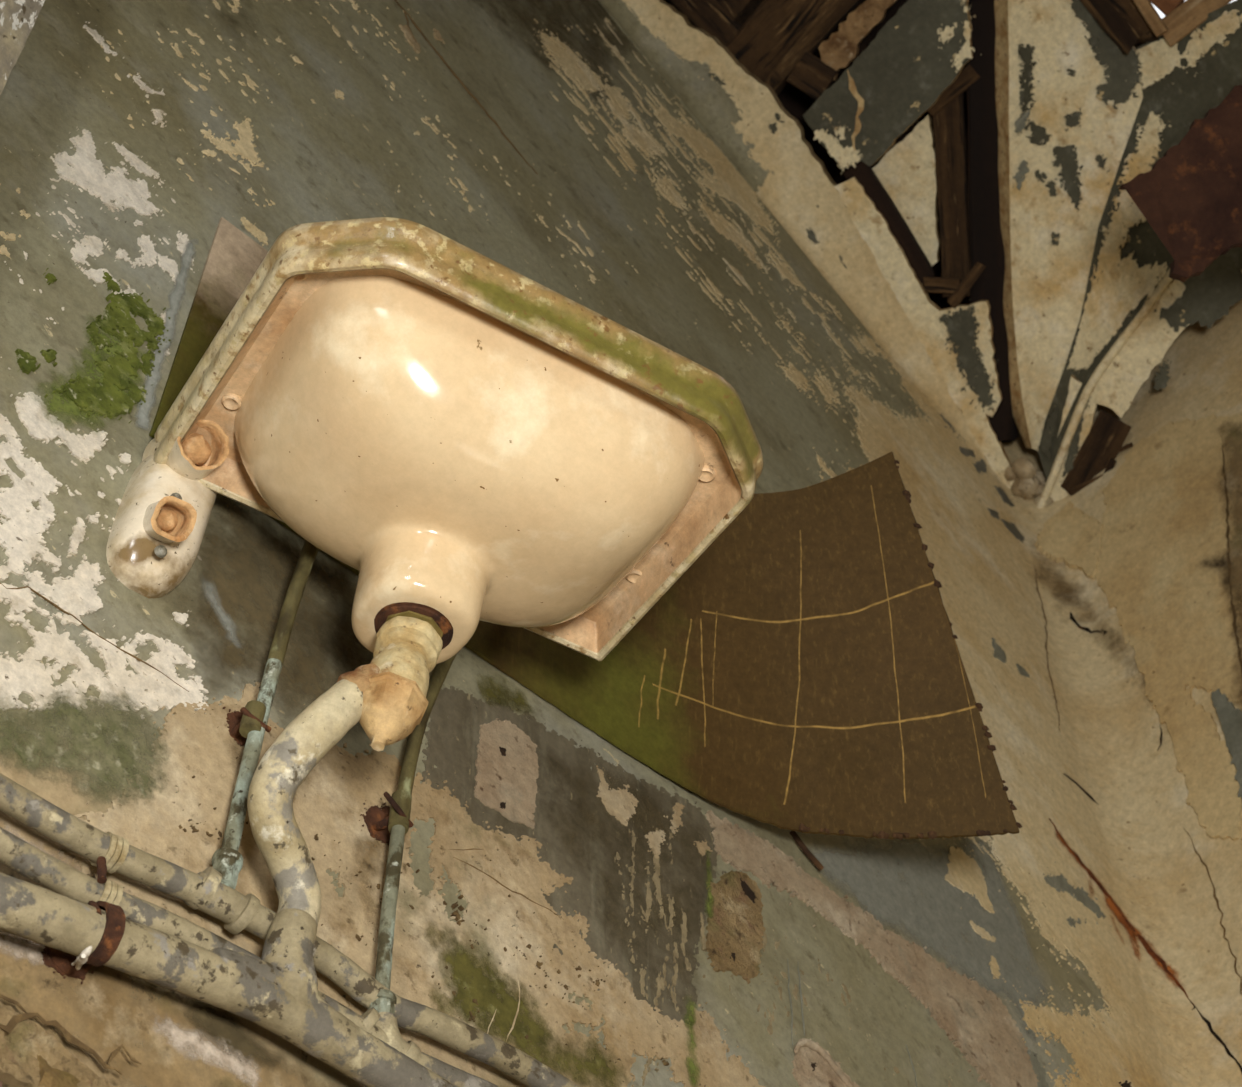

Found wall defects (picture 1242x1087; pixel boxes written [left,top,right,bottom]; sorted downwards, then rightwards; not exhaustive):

peeling [0,231,21,256]
peeling [50,126,199,298]
peeling [200,113,269,170]
peeling [240,217,268,246]
crack [395,0,538,175]
peeling [937,0,1242,482]
peeling [293,18,1204,1087]
peeling [58,846,265,958]
peeling [235,809,279,913]
rust [1056,834,1176,983]
crack [1049,818,1242,1072]
flaking render [0,1001,111,1087]